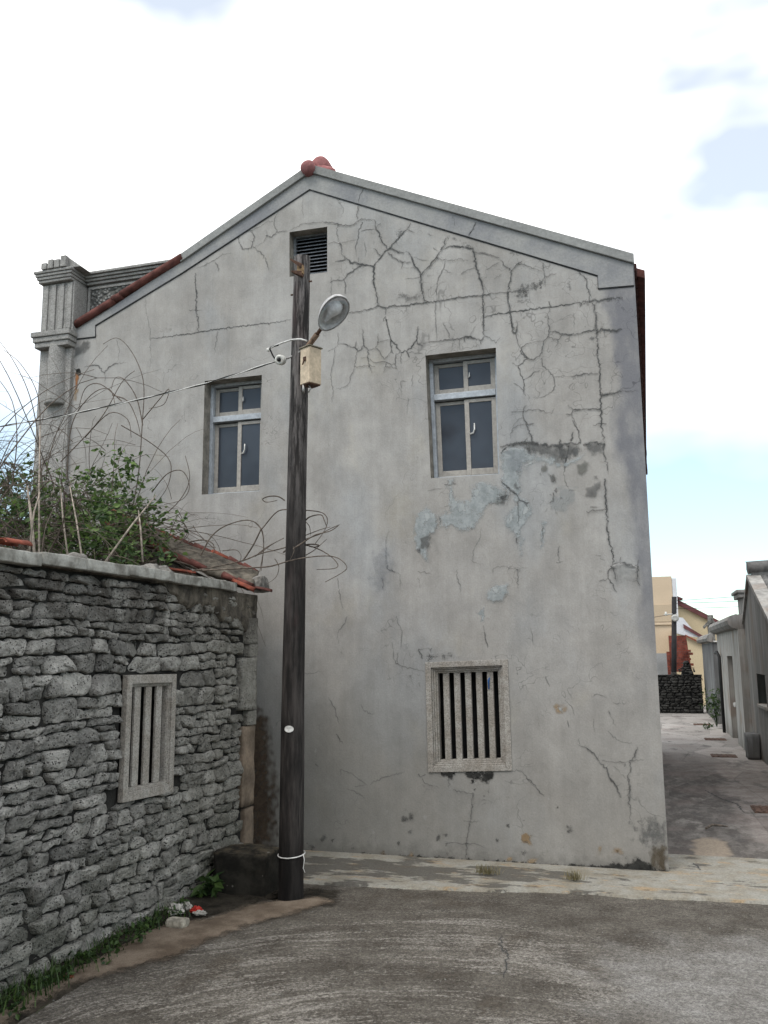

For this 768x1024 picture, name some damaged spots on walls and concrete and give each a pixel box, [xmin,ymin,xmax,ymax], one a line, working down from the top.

crack [156,258,286,339]
crack [238,190,622,562]
peeling [500,448,579,554]
crack [585,747,637,815]